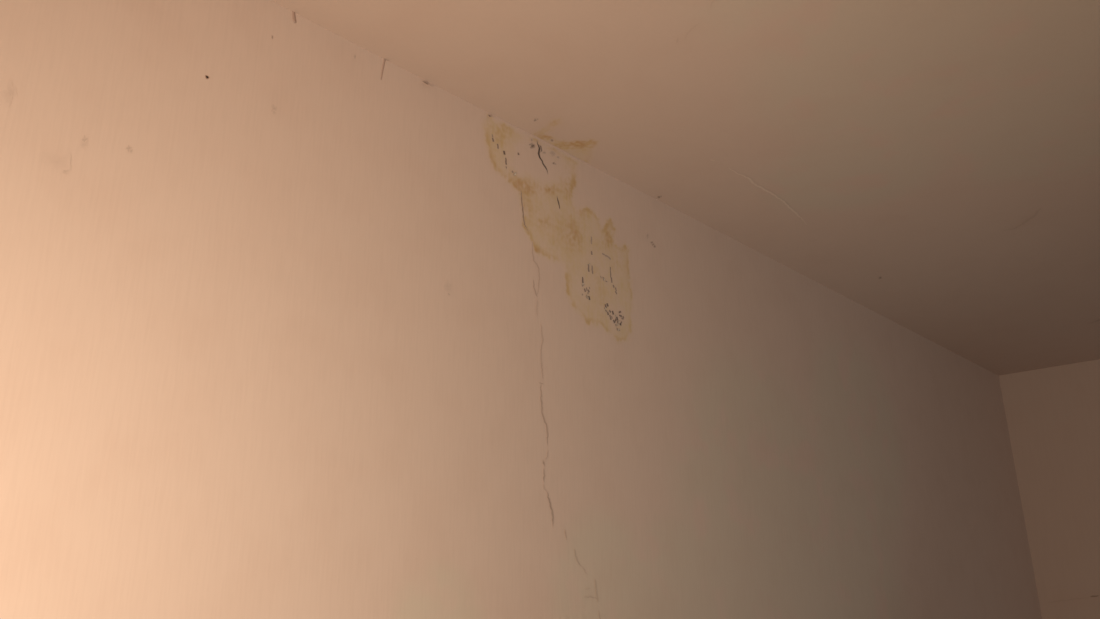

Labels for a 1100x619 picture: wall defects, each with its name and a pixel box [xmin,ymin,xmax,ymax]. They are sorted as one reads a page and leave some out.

damp [480,112,635,347]
crack [521,192,601,619]